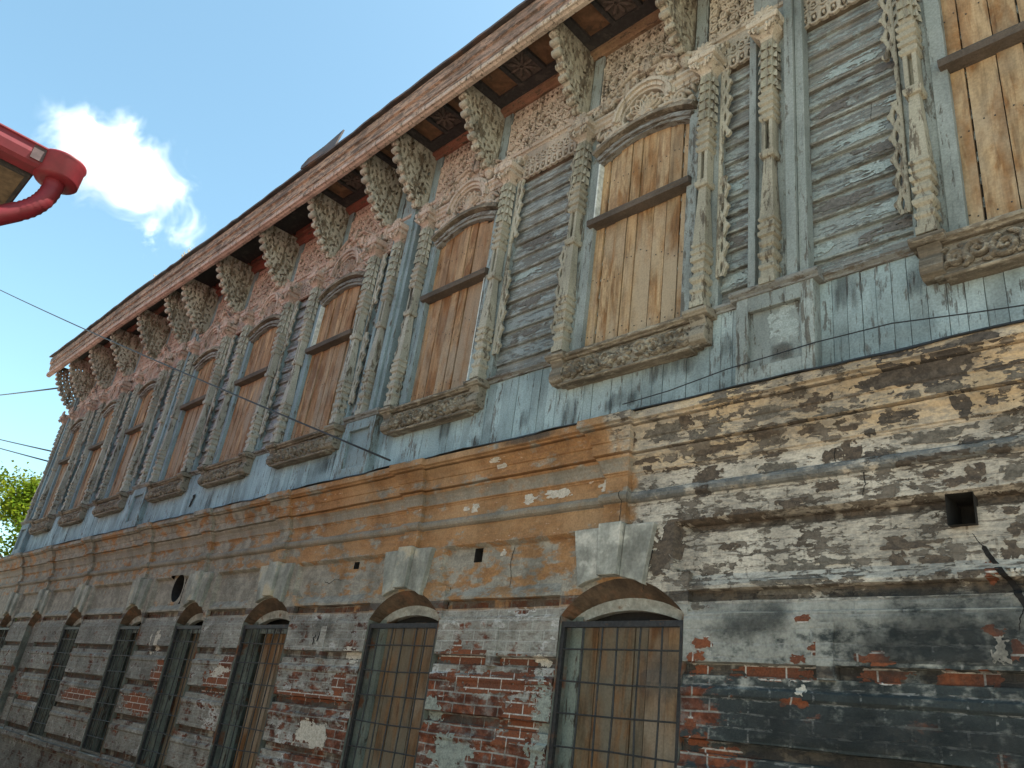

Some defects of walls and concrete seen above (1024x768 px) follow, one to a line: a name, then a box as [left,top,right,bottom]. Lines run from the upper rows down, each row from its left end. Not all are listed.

peeling [811,47,895,120]
peeling [829,119,901,186]
peeling [633,331,1024,582]
peeling [524,488,573,505]
peeling [749,556,864,595]
crack [972,533,1024,631]
flaking render [436,639,554,751]
flaking render [687,636,714,677]
flaking render [729,641,817,709]
flaking render [854,651,917,686]
flaking render [936,624,1024,688]
peeling [291,718,327,750]